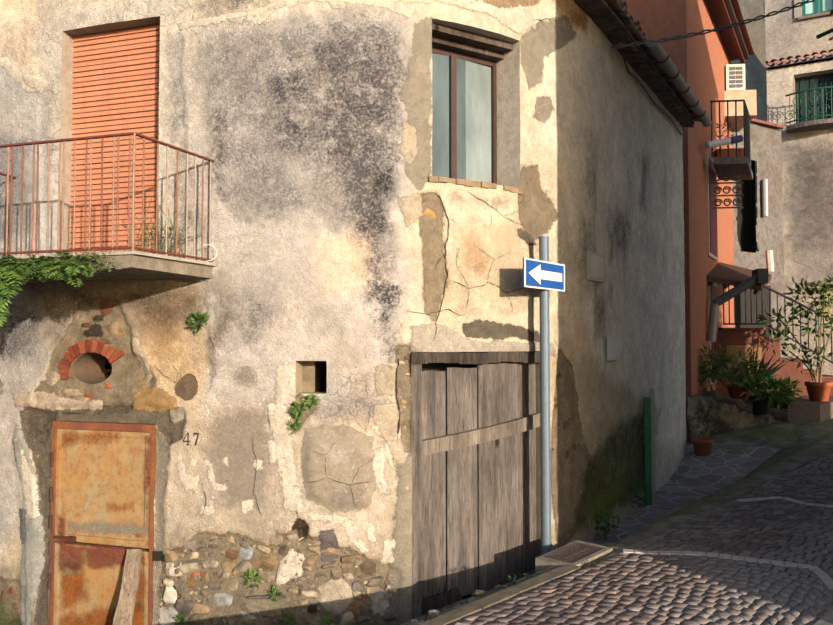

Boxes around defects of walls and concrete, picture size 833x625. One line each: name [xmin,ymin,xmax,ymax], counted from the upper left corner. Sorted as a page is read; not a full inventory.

water stain [207,14,404,263]
spalling [178,0,577,322]
crack [410,192,526,338]
spalling [462,320,540,343]
spalling [0,297,398,625]
rust [62,566,83,606]
rust [60,610,115,625]
rust [132,571,145,625]